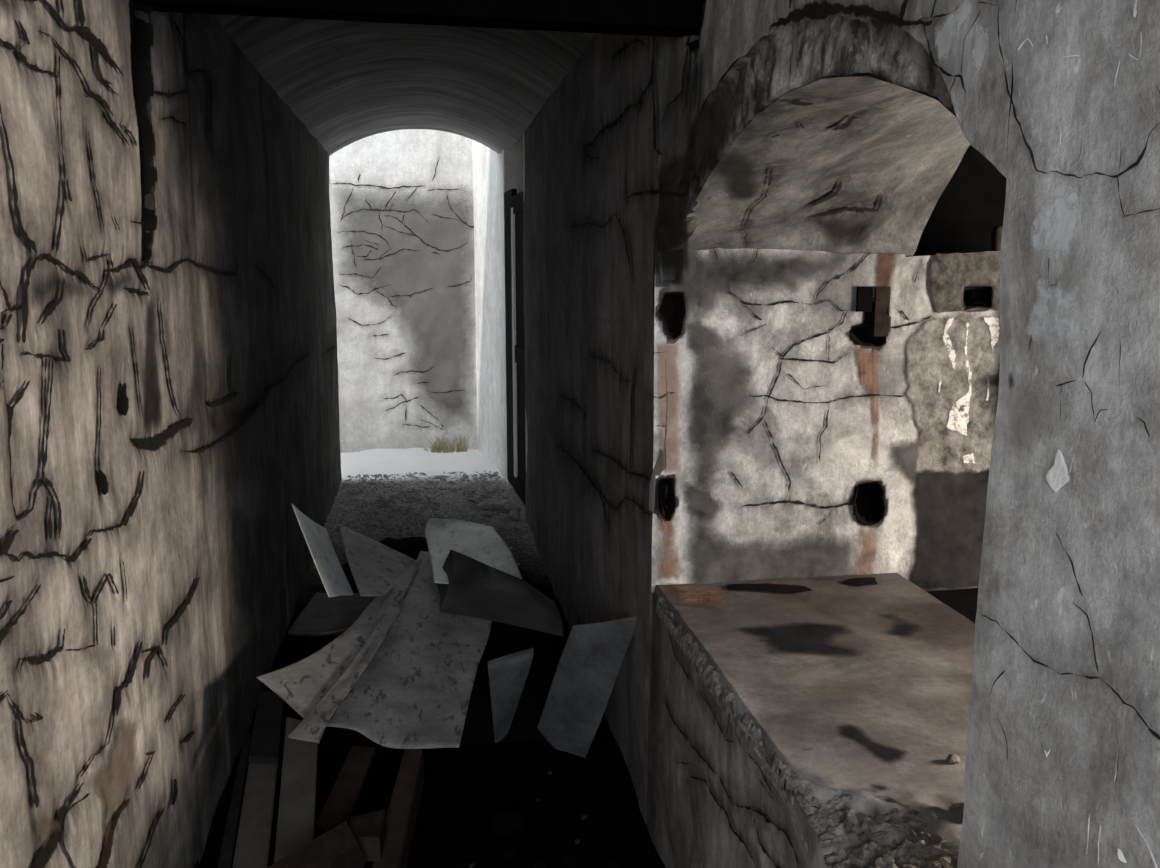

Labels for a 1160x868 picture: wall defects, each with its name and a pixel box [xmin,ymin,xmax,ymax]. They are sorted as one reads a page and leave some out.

crack [899,0,1160,217]
crack [0,0,335,868]
crack [331,157,474,430]
crack [728,182,903,525]
corrosion [858,350,879,454]
corrosion [877,253,895,286]
water stain [893,442,923,481]
peeling [938,318,972,436]
peeling [984,317,1000,361]
water stain [743,623,855,655]
spalling [656,596,959,868]
water stain [842,725,905,761]